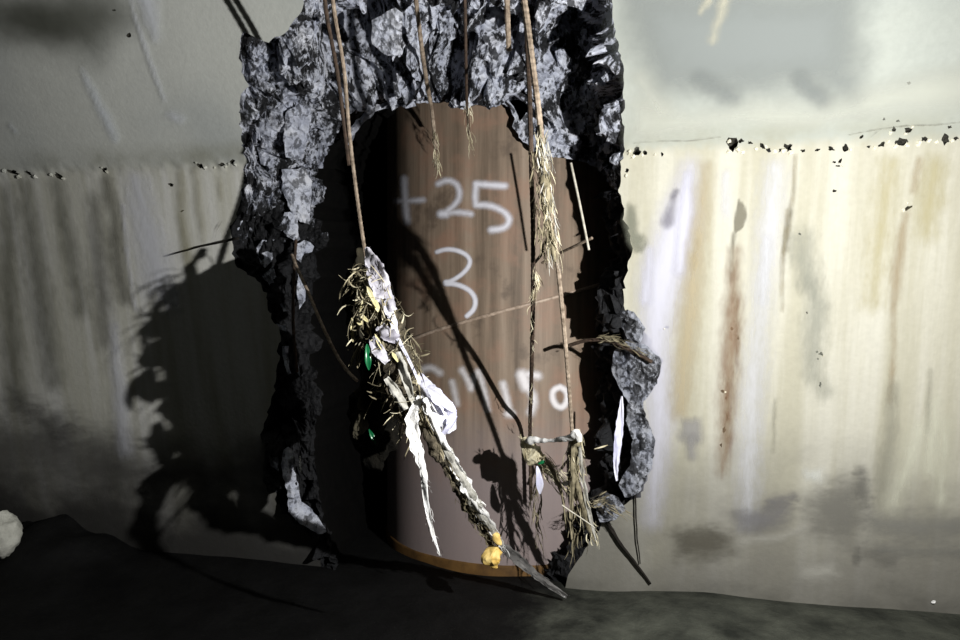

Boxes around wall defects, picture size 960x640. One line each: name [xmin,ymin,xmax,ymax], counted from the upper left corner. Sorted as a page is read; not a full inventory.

spalling [230,0,663,582]
damp [628,169,692,502]
corrosion [724,296,737,450]
damp [733,202,746,243]
damp [743,165,783,525]
spalling [726,137,852,156]
spalling [859,118,959,150]